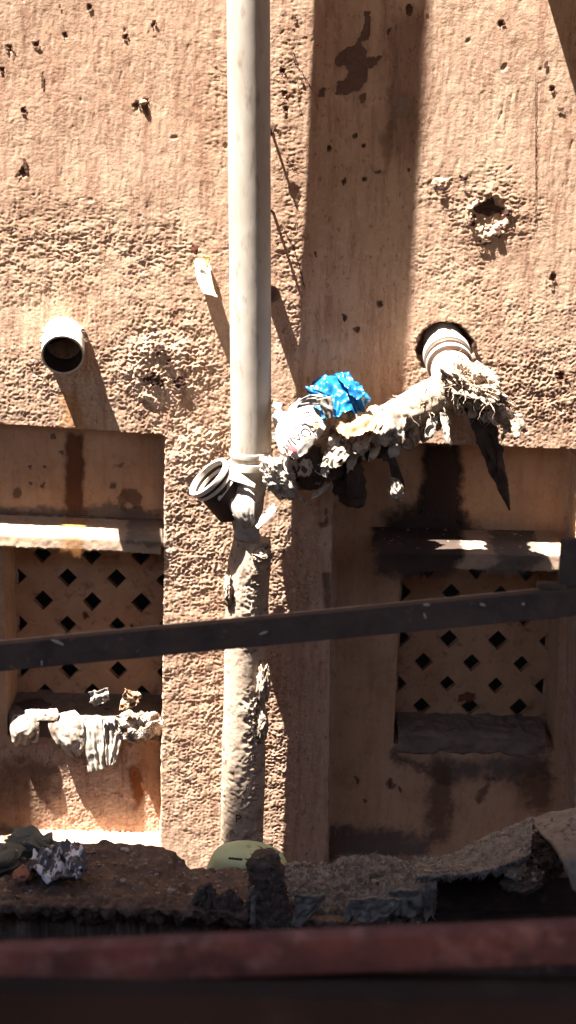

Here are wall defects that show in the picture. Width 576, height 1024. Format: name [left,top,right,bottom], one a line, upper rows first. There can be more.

spalling [466,193,512,245]
rust [65,434,85,518]
damp [372,444,474,579]
damp [485,529,543,576]
damp [329,746,552,862]